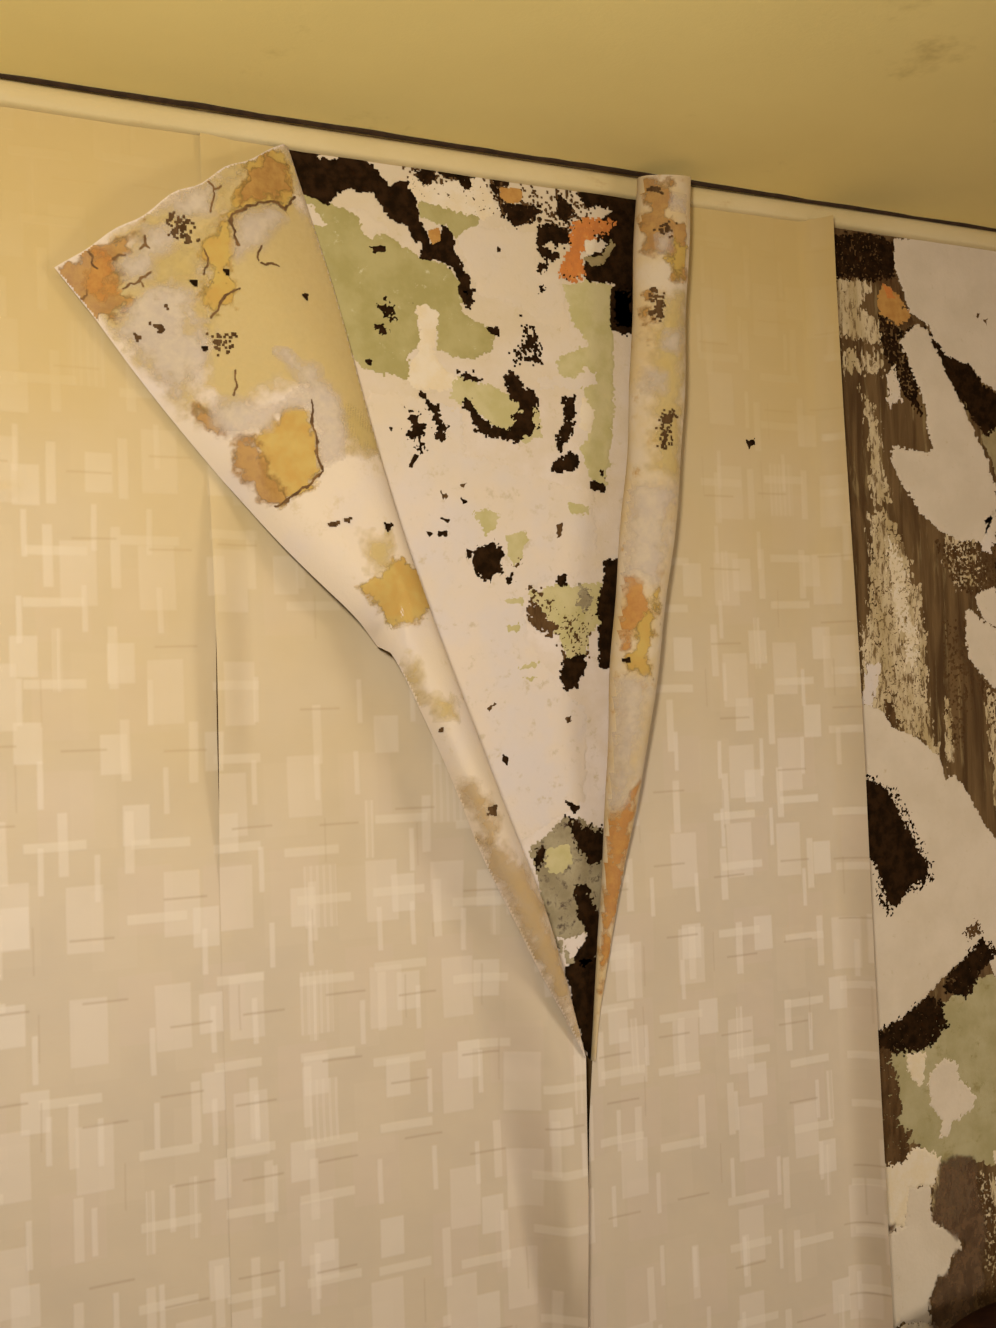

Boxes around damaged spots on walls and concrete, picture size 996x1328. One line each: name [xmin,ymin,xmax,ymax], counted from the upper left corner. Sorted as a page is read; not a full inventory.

peeling [123,229,172,275]
peeling [176,188,210,214]
peeling [238,210,282,252]
spalling [890,238,996,554]
flaking render [304,161,632,1008]
spalling [965,586,996,688]
spalling [862,704,996,1328]